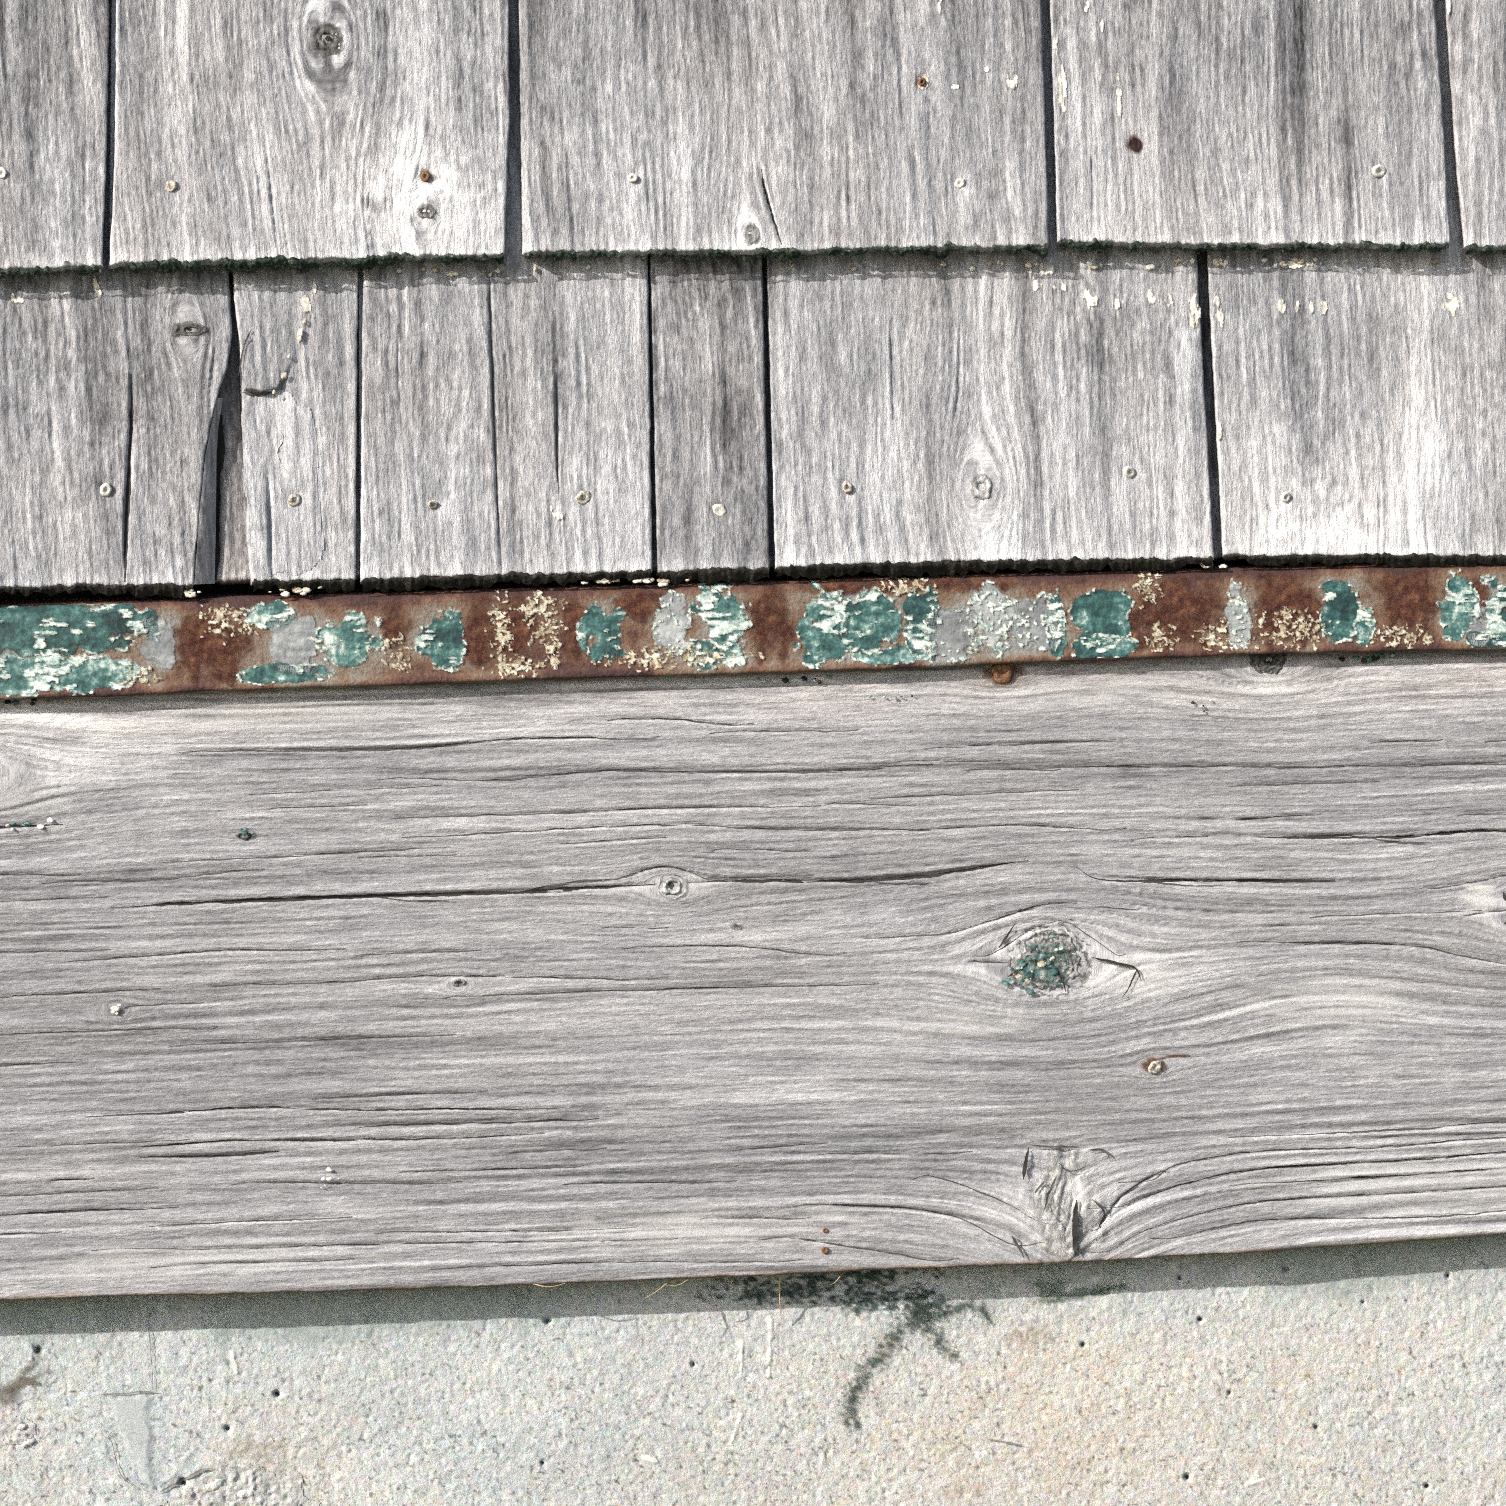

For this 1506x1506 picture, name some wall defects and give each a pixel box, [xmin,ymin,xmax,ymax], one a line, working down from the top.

peeling [1146,289,1223,328]
crack [215,415,225,580]
spalling [184,282,467,685]
peeling [0,604,175,706]
rust [175,616,251,686]
rust [461,595,536,665]
peeling [757,563,1506,684]
rust [1254,573,1323,652]
crack [0,718,1506,908]
crack [0,867,1506,1067]
crack [0,1091,1506,1270]
damp [696,1269,989,1428]